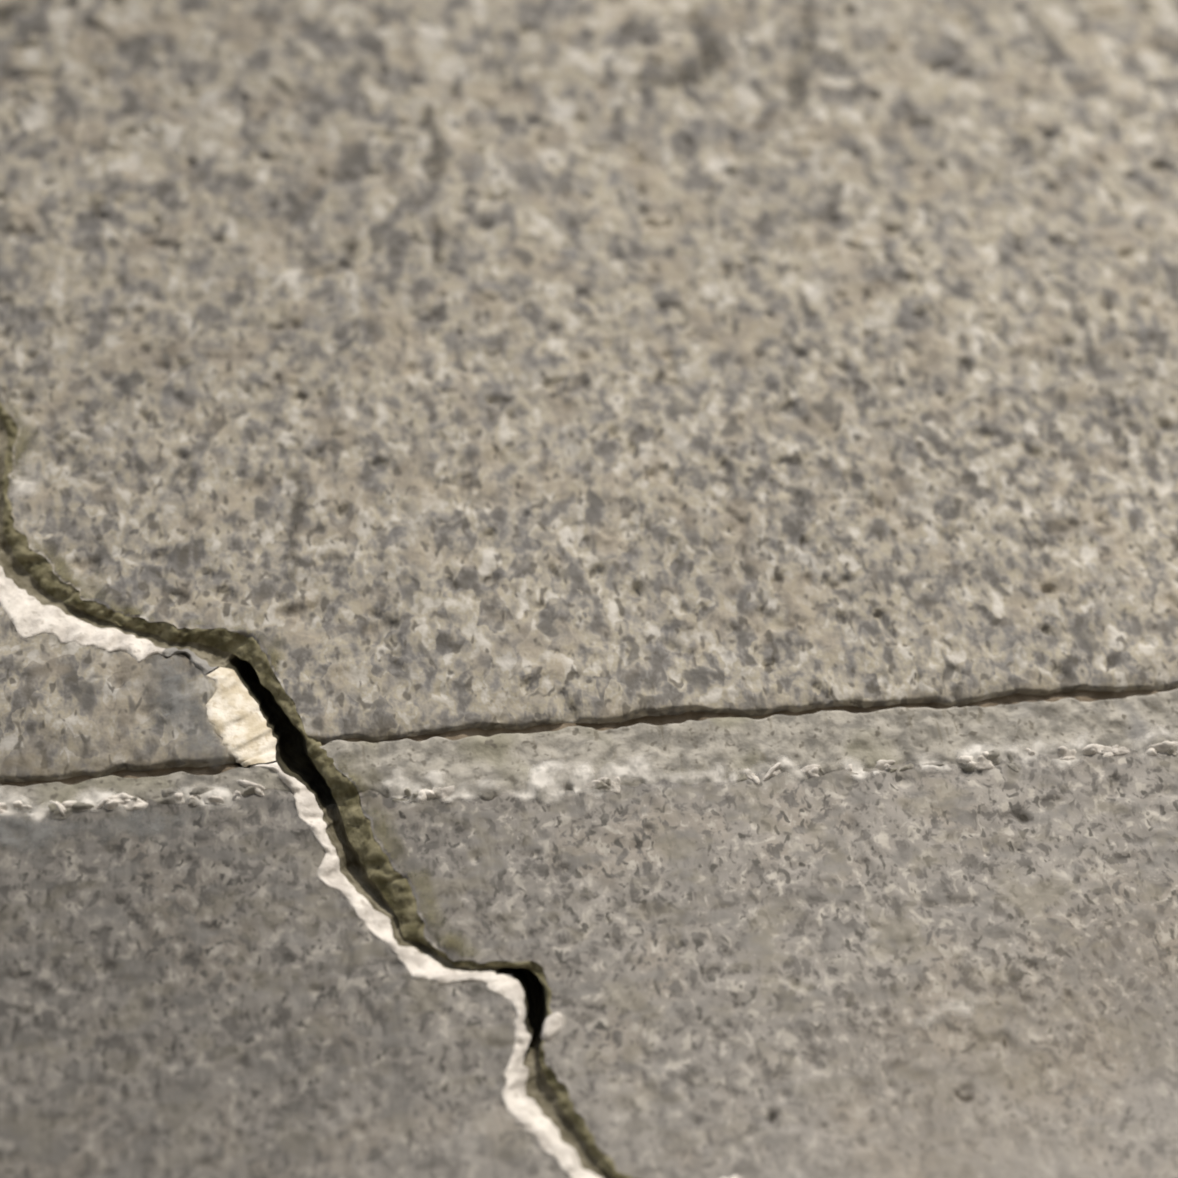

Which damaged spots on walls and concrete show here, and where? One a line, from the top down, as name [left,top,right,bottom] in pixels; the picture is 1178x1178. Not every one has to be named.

crack [0,402,632,1178]